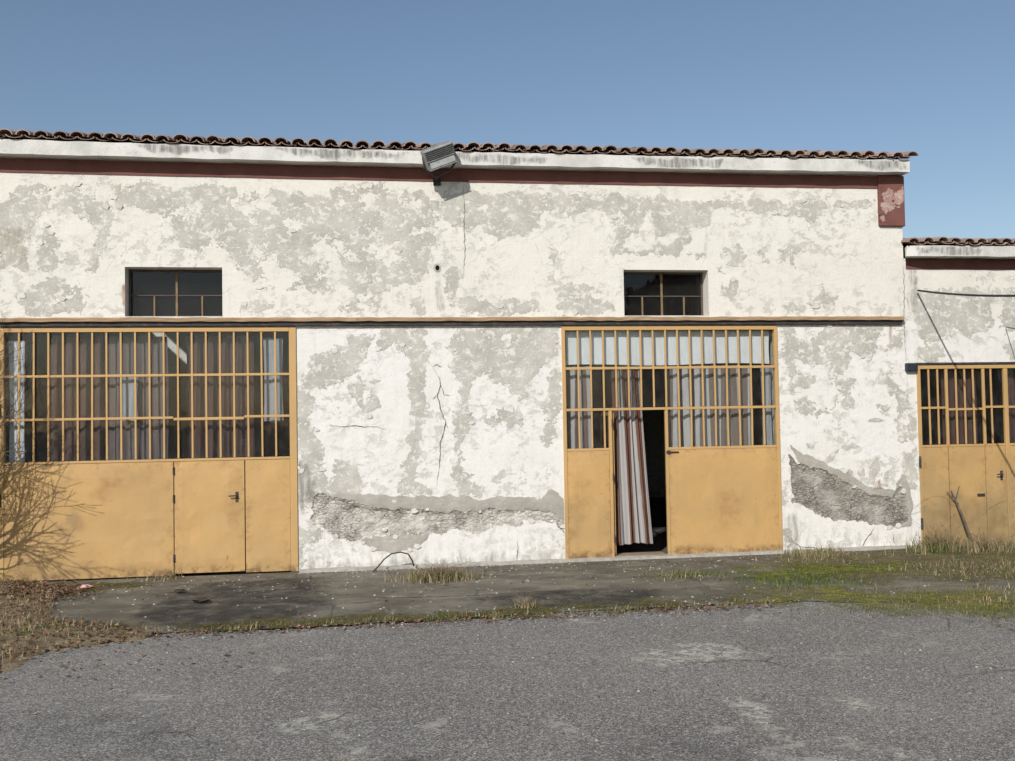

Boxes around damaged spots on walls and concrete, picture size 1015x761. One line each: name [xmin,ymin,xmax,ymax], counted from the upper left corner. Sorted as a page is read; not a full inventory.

crack [433,364,448,478]
peeling [0,178,918,569]
peeling [912,285,1015,362]